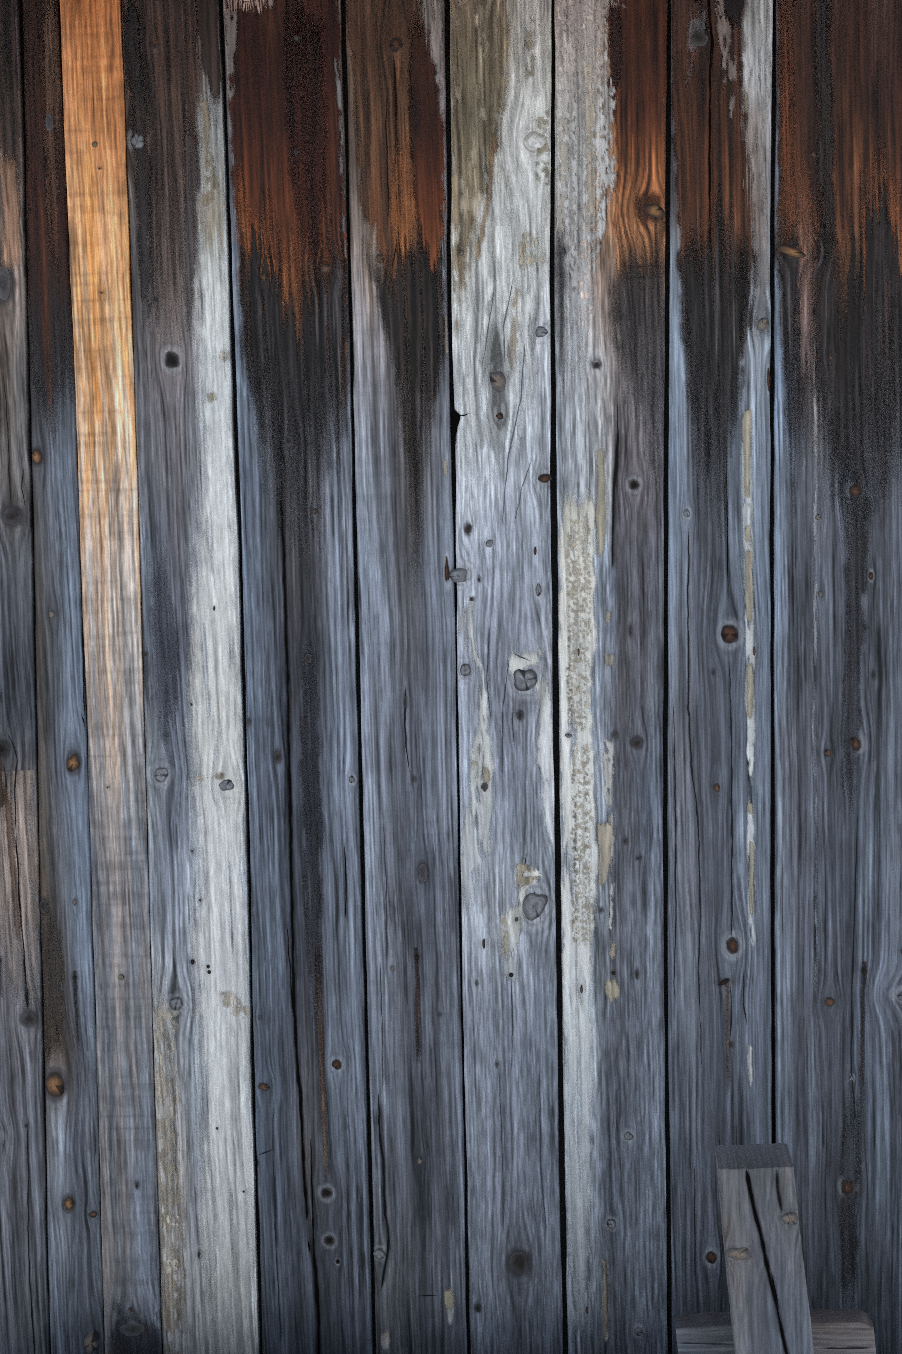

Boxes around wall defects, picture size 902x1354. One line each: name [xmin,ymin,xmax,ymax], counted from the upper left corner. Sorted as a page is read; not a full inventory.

leakage [122,0,509,522]
leakage [507,290,518,369]
leakage [556,232,567,341]
leakage [607,0,757,464]
leakage [777,0,902,792]
peeling [498,863,541,982]
peeling [509,450,619,1339]
crack [719,1128,788,1354]
crack [826,1344,868,1352]